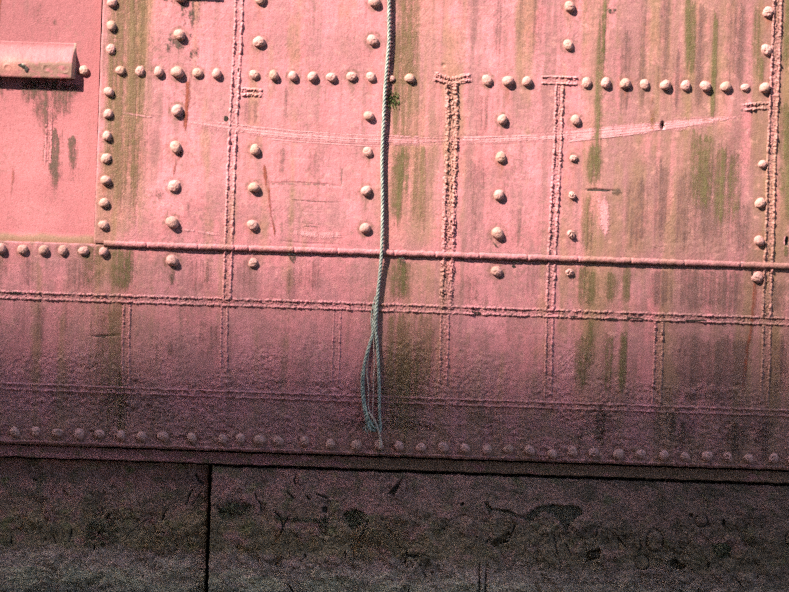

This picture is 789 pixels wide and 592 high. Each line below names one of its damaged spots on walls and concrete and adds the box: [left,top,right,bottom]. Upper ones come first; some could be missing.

water stain [22,79,80,185]
water stain [191,0,438,222]
water stain [453,0,747,246]
water stain [605,333,627,391]
peeling [344,509,365,530]
peeling [484,503,591,547]